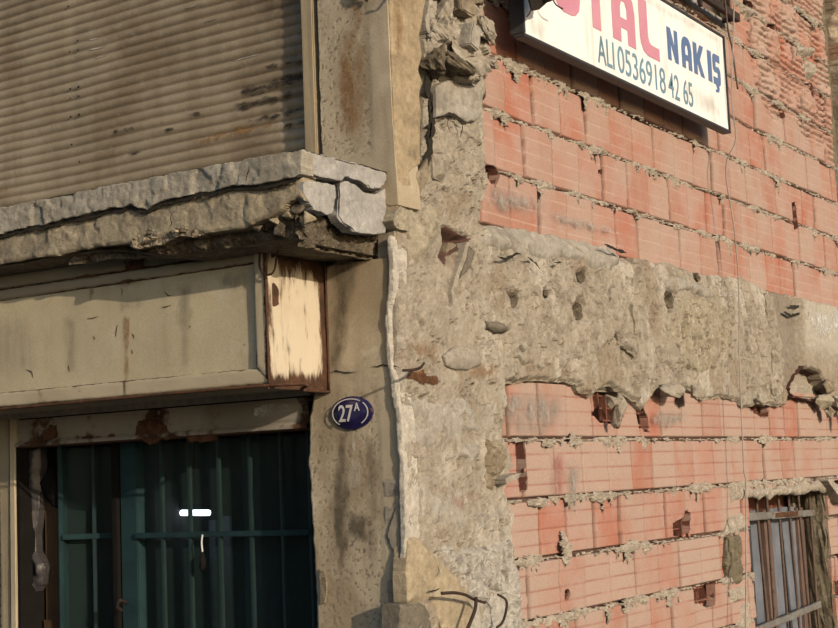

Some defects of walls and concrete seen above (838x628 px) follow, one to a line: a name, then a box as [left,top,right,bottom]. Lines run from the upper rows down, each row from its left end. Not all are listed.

flaking render [419,0,437,35]
spalling [416,129,498,194]
crack [0,170,381,238]
spalling [485,280,615,371]
spalling [662,295,736,373]
spalling [69,204,527,628]
spalling [590,392,622,429]
spalling [786,366,835,403]
leakage [335,438,366,553]
spalling [673,509,691,538]